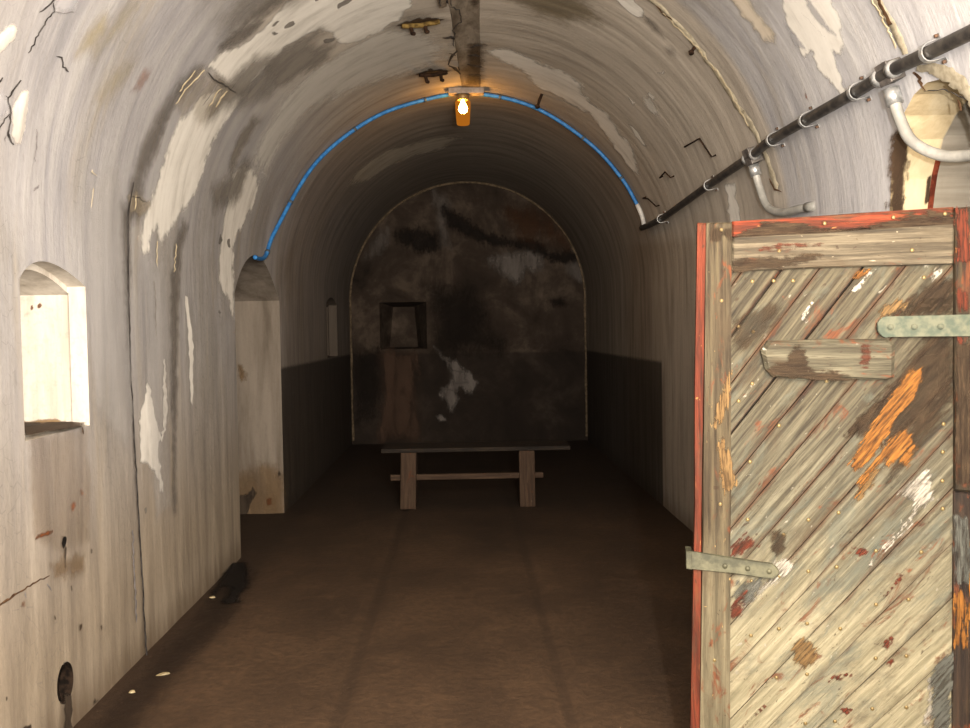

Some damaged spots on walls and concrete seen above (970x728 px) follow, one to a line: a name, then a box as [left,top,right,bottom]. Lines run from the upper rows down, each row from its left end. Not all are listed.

peeling [0,25,17,53]
crack [28,0,72,53]
peeling [732,0,775,42]
peeling [783,0,845,94]
spalling [916,63,970,111]
crack [0,77,38,162]
peeling [12,91,29,143]
peeling [132,0,456,317]
damp [442,204,577,263]
peeling [139,359,168,492]
crack [0,575,52,606]